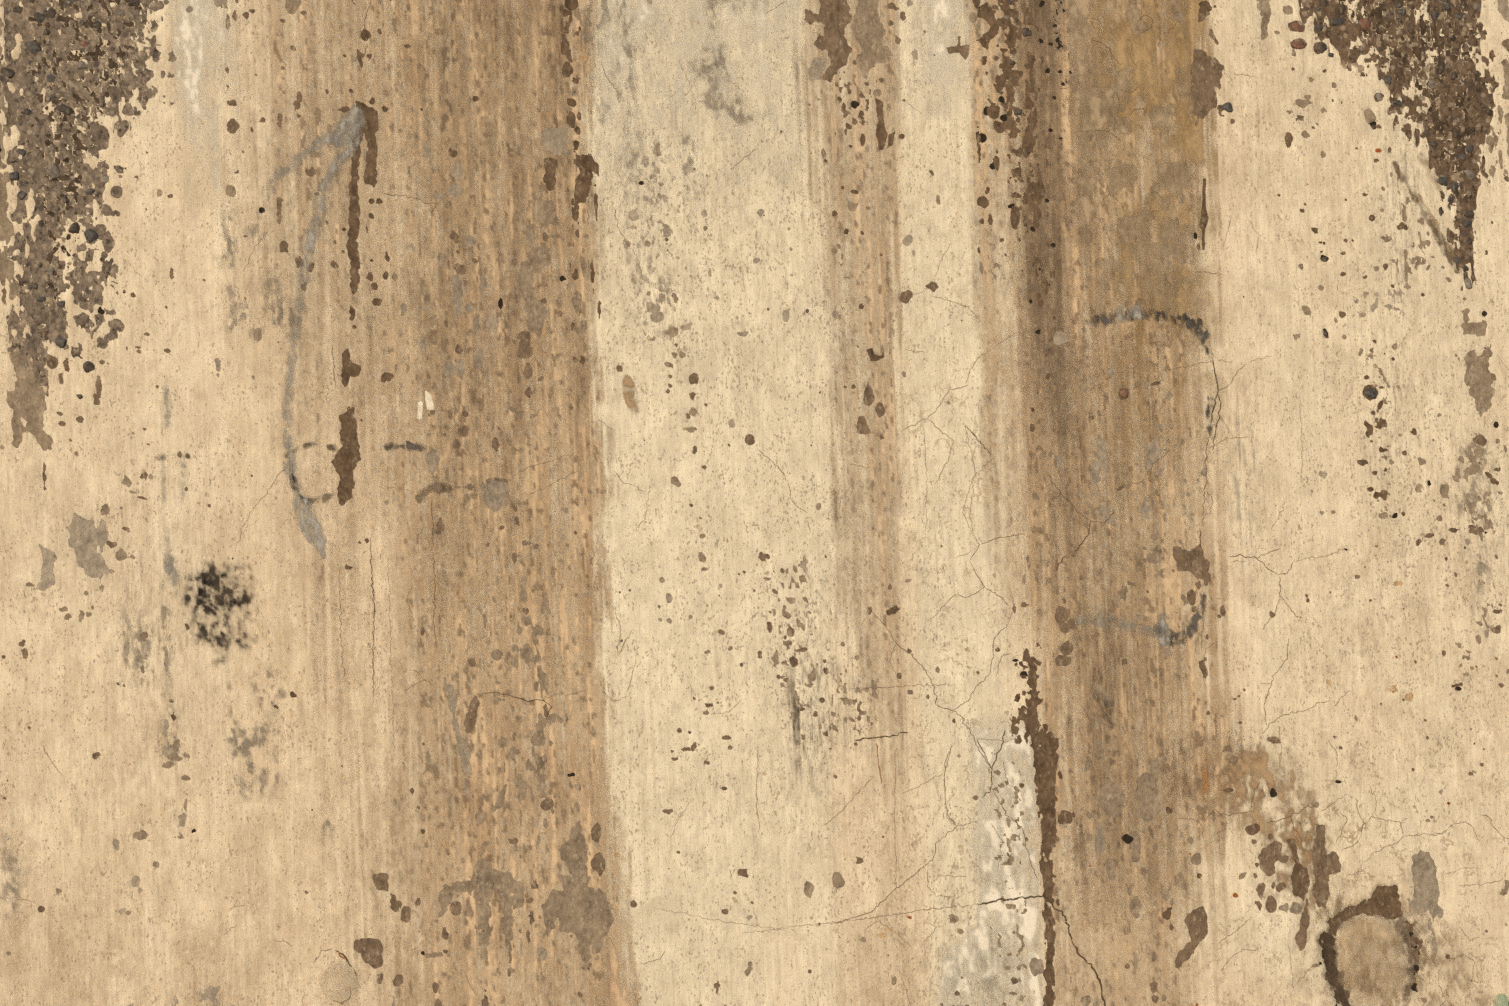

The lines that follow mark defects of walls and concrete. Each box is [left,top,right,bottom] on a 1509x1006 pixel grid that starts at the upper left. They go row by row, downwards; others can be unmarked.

spalling [2,639,28,659]
spalling [0,0,177,491]
spalling [225,67,302,133]
crack [759,450,810,530]
leakage [796,0,903,724]
crack [824,244,1106,1006]
crack [1031,420,1169,570]
leakage [925,0,1442,1006]
crack [1155,356,1509,886]
spalling [1257,0,1509,587]
spalling [1442,555,1502,691]
crack [1218,921,1321,991]